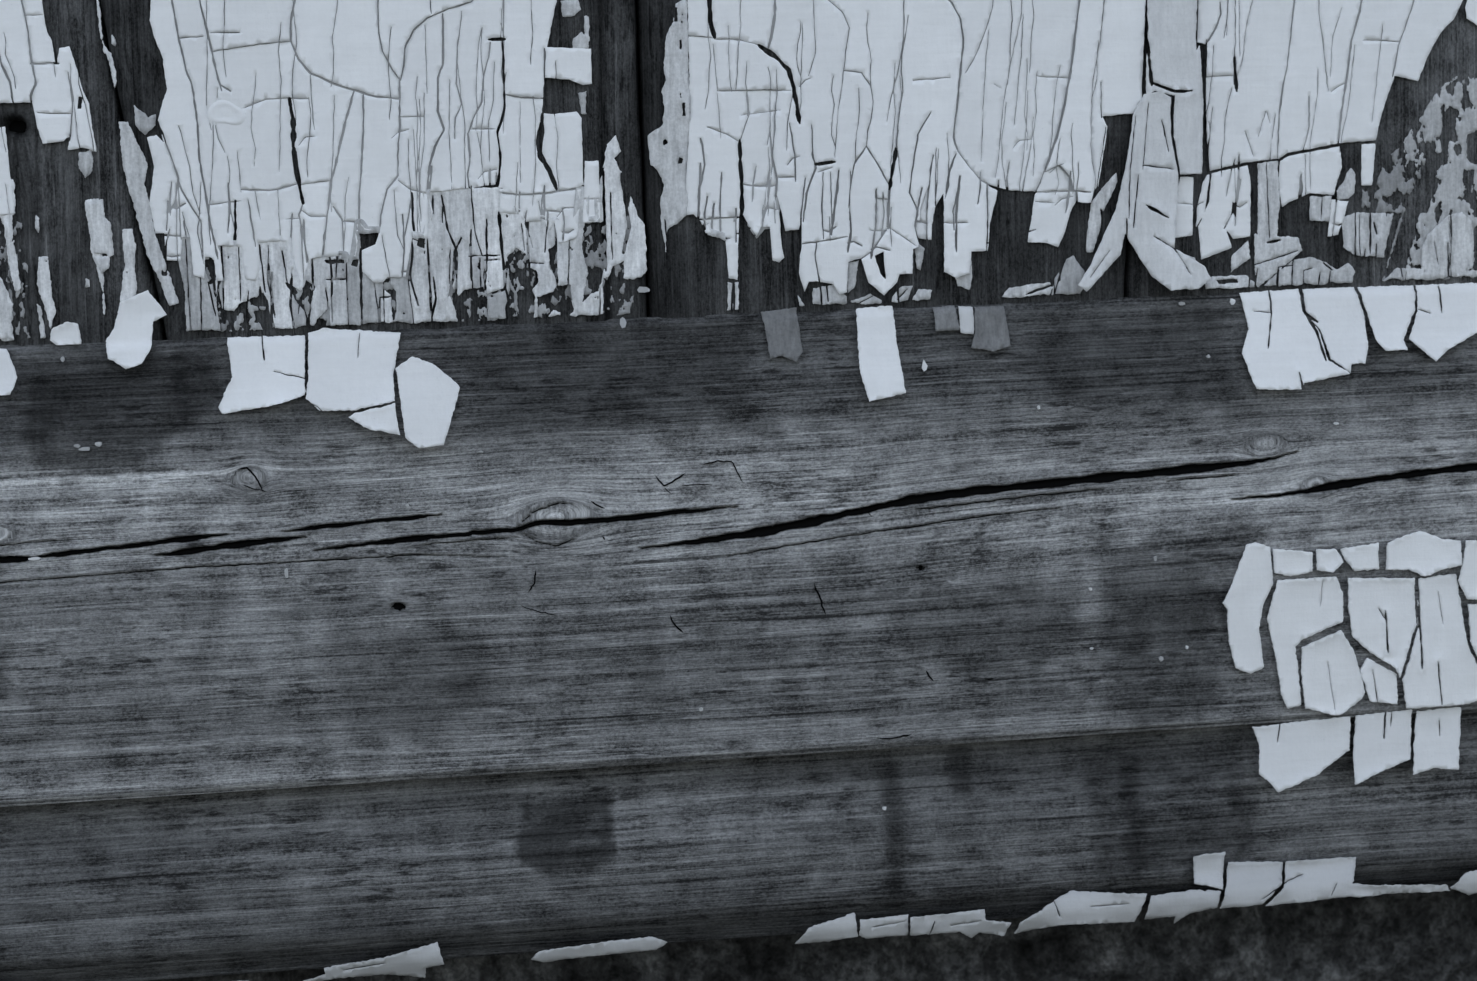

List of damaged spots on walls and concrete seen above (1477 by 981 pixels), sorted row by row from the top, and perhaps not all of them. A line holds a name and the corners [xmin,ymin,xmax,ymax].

peeling [0,0,97,178]
peeling [0,127,82,396]
peeling [85,0,1477,448]
crack [0,452,1477,616]
peeling [1223,531,1477,792]
peeling [304,942,444,981]
peeling [531,936,667,962]
peeling [795,852,1477,944]